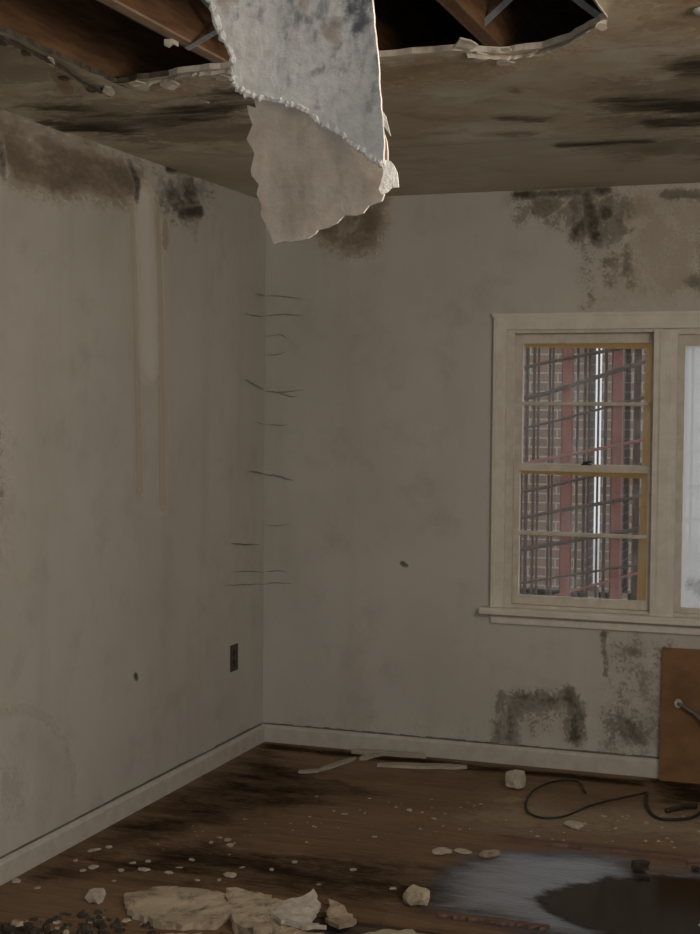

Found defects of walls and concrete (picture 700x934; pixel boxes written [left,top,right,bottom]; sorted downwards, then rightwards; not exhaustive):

peeling [453,37,488,62]
peeling [129,80,180,92]
leakage [589,55,700,129]
leakage [553,139,700,161]
leakage [0,46,256,379]
leakage [315,198,389,257]
leakage [512,187,660,288]
leakage [659,189,700,222]
crack [245,294,301,355]
crack [250,471,293,481]
leakage [493,685,587,747]
leakage [600,630,671,749]